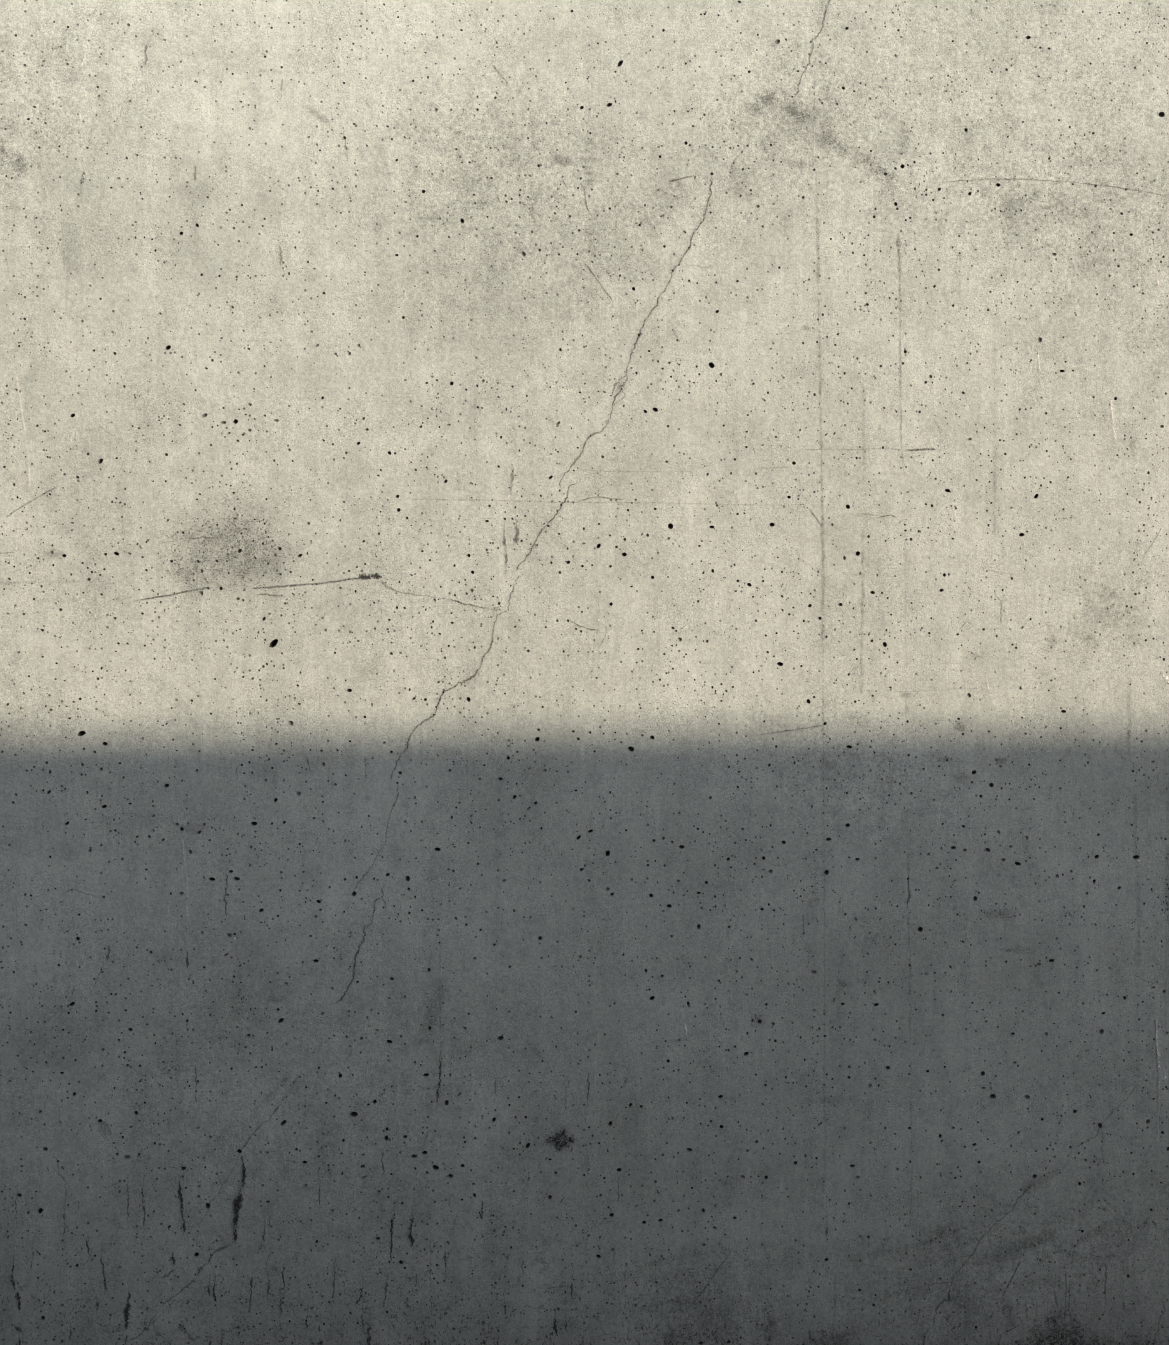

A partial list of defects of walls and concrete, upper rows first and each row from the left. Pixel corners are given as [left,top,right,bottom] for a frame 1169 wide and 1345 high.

crack [257,573,402,595]